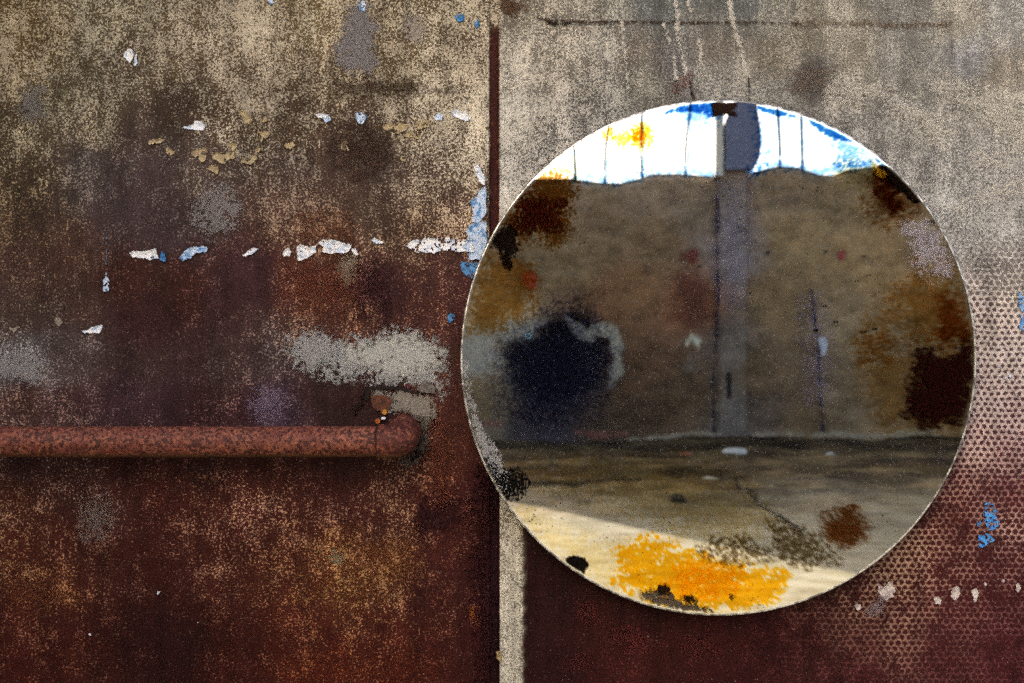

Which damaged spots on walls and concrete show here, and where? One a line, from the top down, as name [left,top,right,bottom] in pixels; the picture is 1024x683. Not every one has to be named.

peeling [183,121,205,130]
peeling [382,110,472,139]
peeling [148,138,175,155]
peeling [191,110,270,174]
peeling [408,164,487,278]
peeling [129,248,166,262]
peeling [180,246,208,261]
peeling [283,239,359,261]